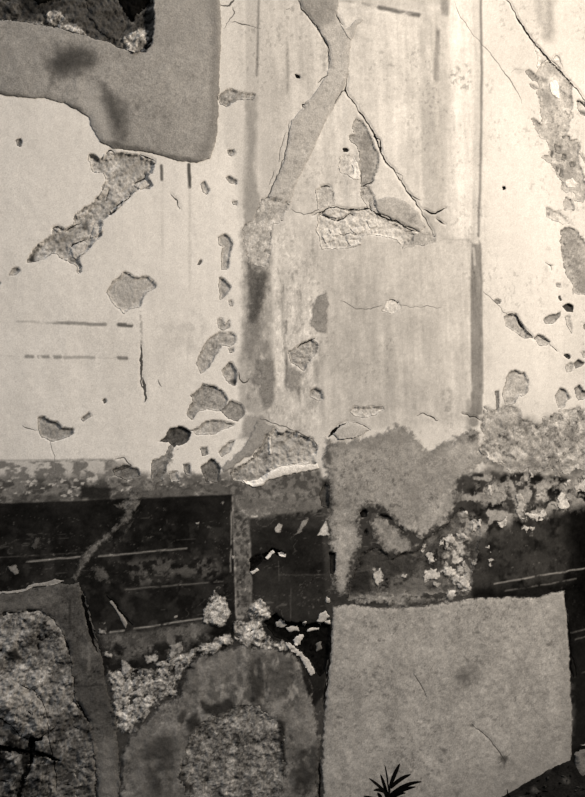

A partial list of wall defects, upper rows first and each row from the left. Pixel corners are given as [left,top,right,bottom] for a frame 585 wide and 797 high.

crack [286,2,330,83]
crack [507,0,585,107]
spalling [27,150,155,273]
crack [293,80,445,237]
spalling [315,118,436,250]
spalling [525,43,585,333]
crack [139,345,162,402]
spalling [150,384,245,482]
water stain [247,263,275,407]
spalling [346,370,585,601]
spalling [99,592,330,733]
crack [0,685,90,797]